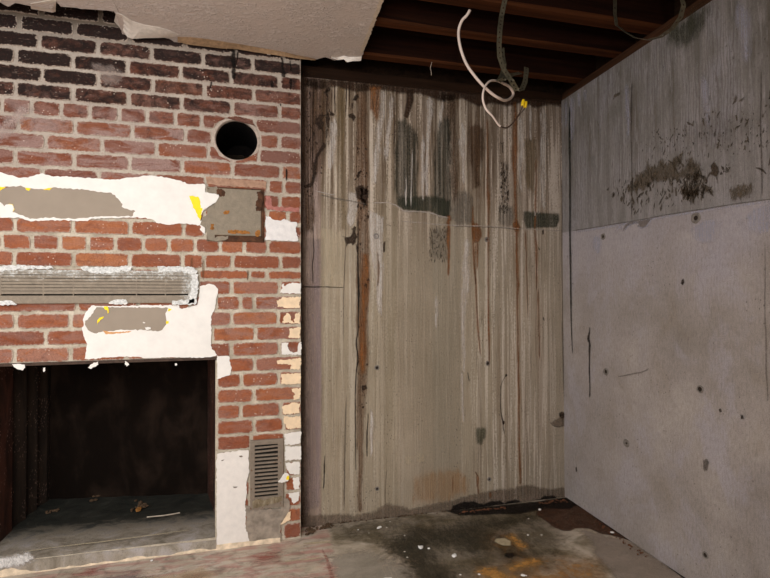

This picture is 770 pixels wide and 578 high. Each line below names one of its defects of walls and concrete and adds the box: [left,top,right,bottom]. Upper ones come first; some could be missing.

peeling [0,172,226,234]
peeling [82,284,232,379]
peeling [255,191,298,241]
peeling [277,282,302,525]
rust [355,87,370,511]
water stain [301,75,628,578]
rust [472,121,490,362]
rust [474,534,603,578]